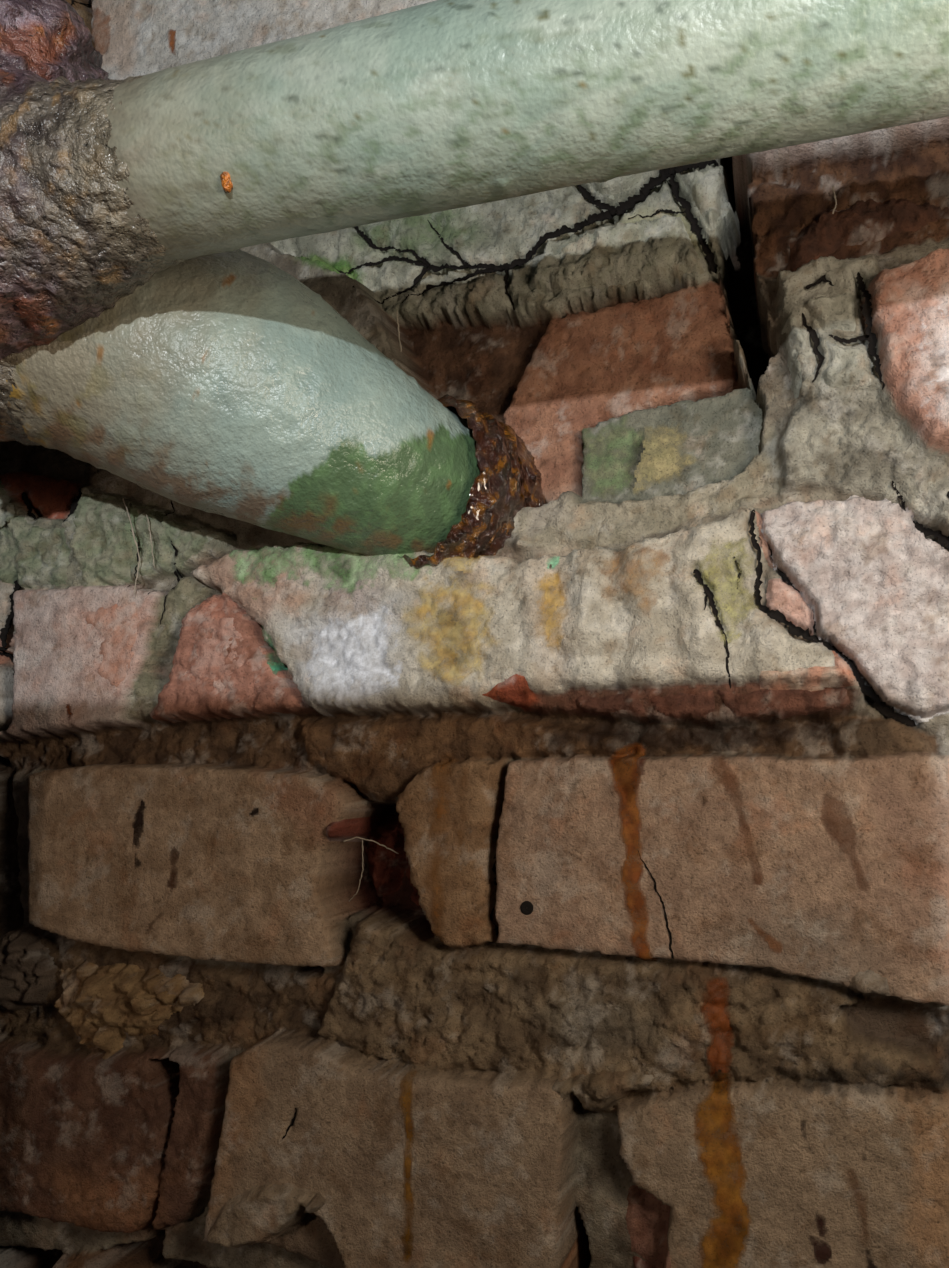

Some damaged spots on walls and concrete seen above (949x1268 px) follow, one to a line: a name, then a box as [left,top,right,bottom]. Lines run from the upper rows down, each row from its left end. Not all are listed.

crack [337,160,734,310]
crack [802,272,885,390]
crack [693,509,916,727]
crack [892,481,949,549]
corrosion [609,744,657,960]
corrosion [696,979,750,1268]